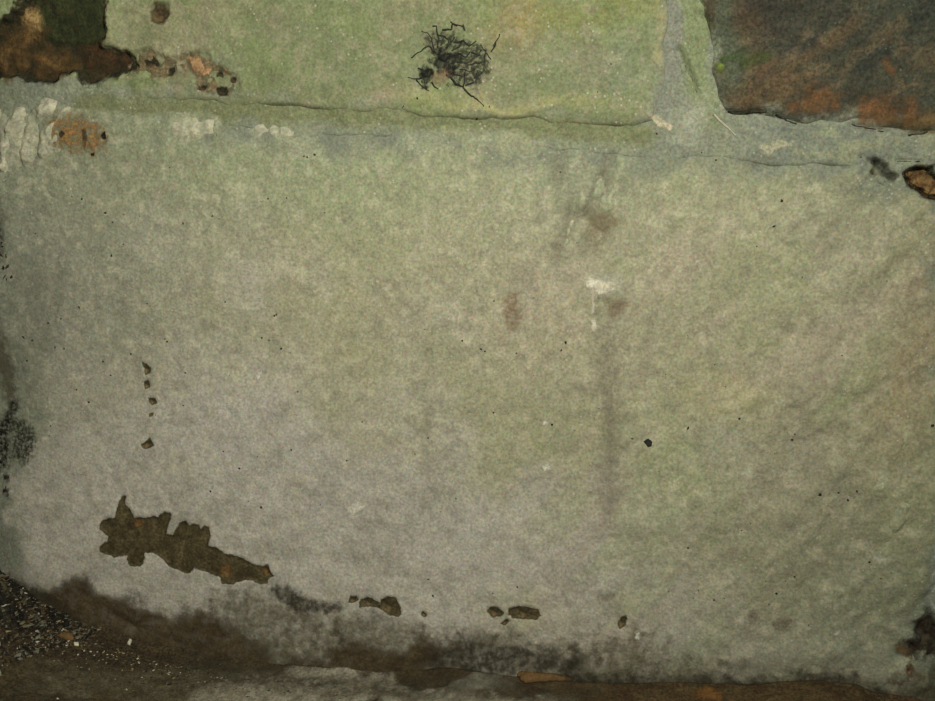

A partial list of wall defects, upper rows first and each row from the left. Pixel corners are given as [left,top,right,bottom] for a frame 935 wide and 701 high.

spalling [0,0,237,96]
spalling [49,114,108,156]
spalling [870,157,935,199]
peeling [142,362,157,417]
peeling [99,496,274,585]
peeling [348,596,401,617]
leakage [11,578,935,701]
peeling [487,606,541,625]
spalling [896,614,935,675]